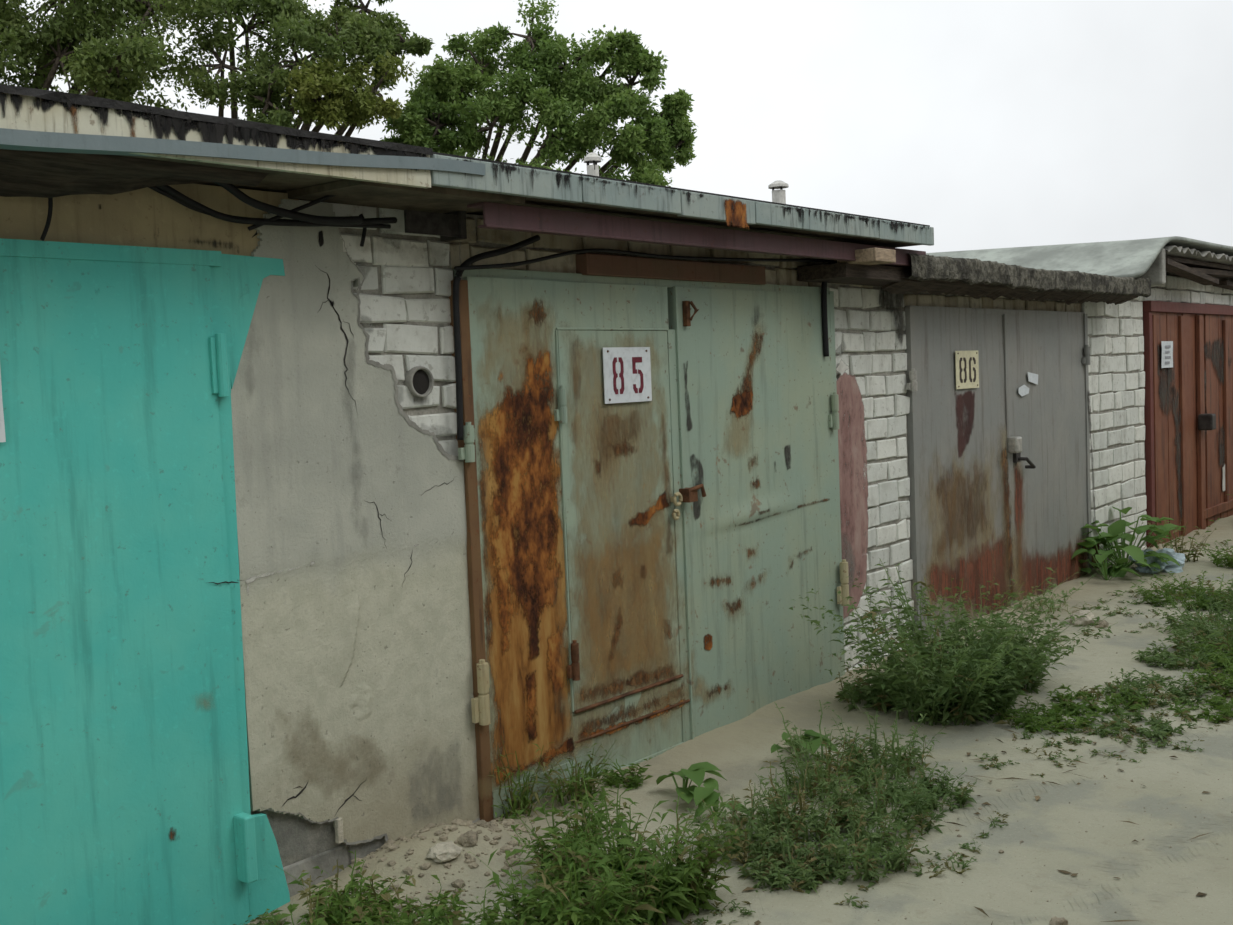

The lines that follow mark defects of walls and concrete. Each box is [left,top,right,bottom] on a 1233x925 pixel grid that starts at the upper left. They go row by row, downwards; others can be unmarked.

leakage [0,92,23,118]
leakage [97,107,108,125]
leakage [149,114,388,154]
corrosion [725,199,749,228]
crack [315,265,357,410]
flaking render [299,200,464,462]
corrosion [731,333,763,418]
crack [363,500,413,587]
corrosion [478,350,727,787]
corrosion [930,449,1086,612]
flaking render [261,807,388,845]